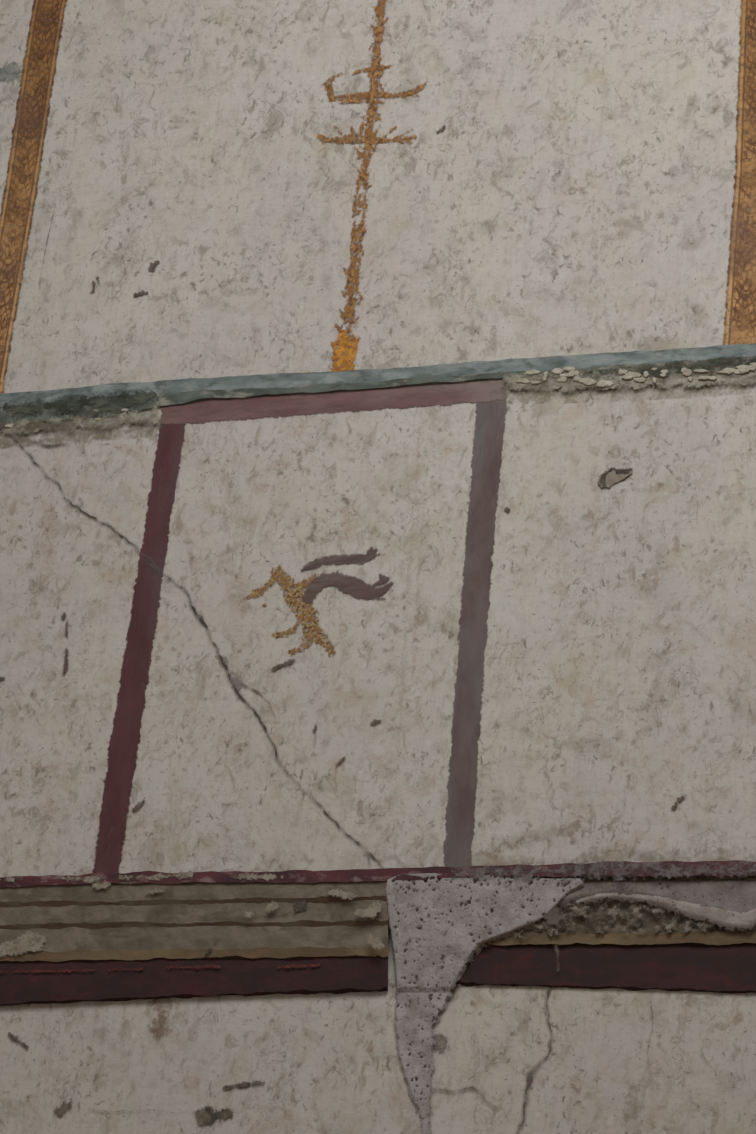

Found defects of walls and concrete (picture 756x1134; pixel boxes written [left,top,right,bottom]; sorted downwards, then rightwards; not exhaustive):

peeling [502,356,756,394]
crack [0,419,383,868]
spalling [432,1034,450,1052]
crack [519,908,563,1128]